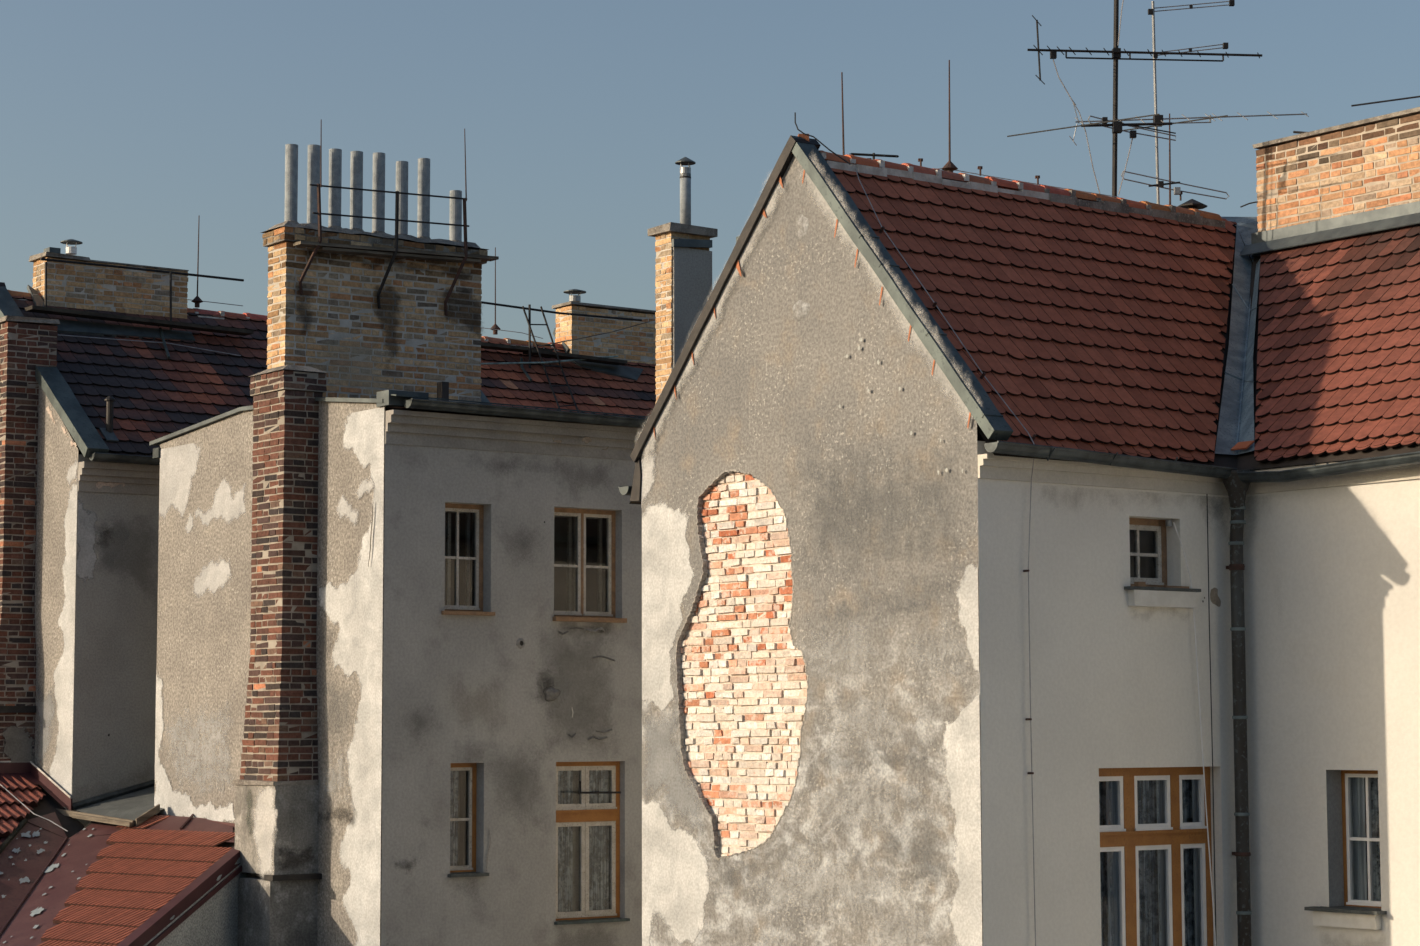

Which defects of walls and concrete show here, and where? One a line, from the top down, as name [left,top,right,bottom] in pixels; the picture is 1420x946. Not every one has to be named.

leakage [641,454,710,946]
flaking render [675,469,809,861]
leakage [754,856,900,911]
leakage [943,694,982,946]